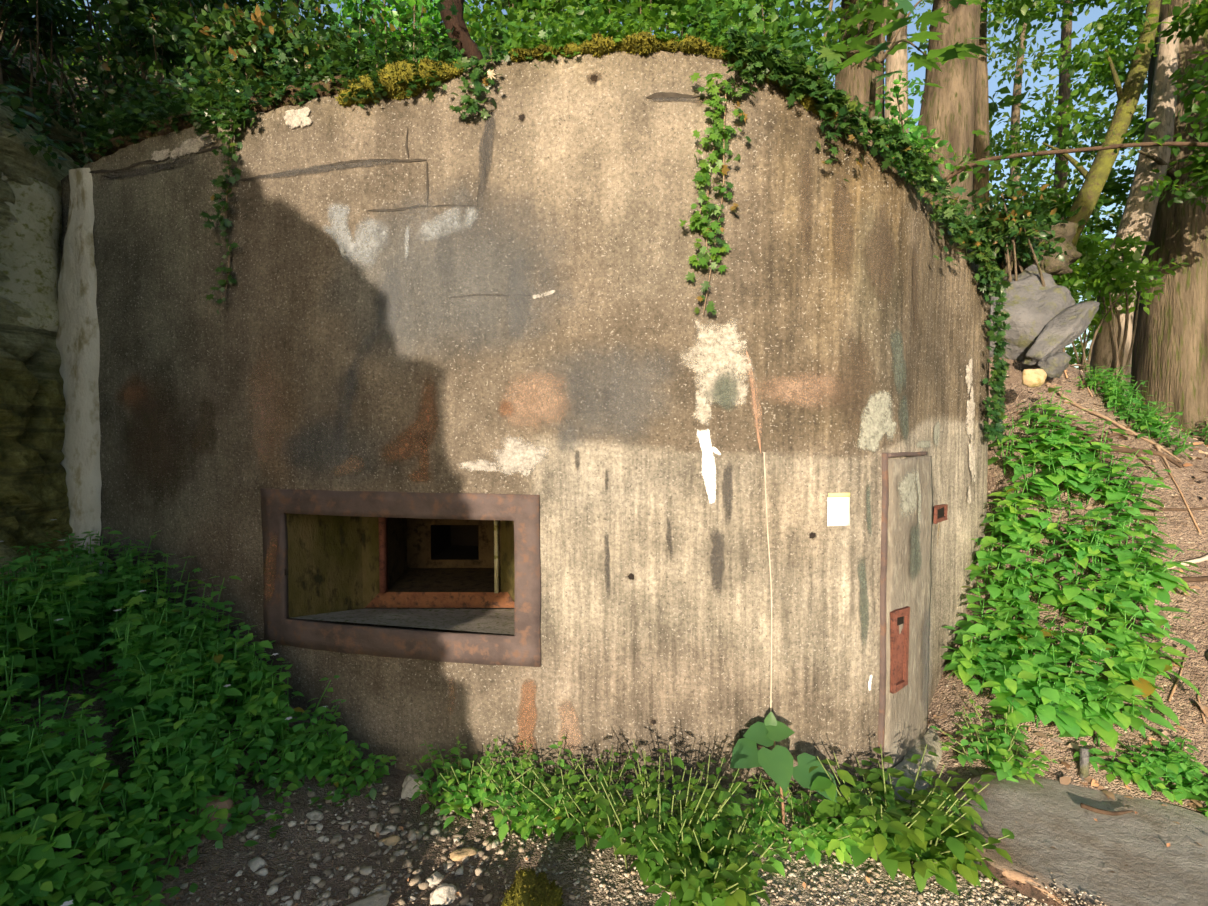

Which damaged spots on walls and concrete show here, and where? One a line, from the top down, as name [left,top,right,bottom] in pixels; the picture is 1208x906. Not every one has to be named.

crack [239,111,495,211]
damp [680,321,753,520]
damp [711,532,724,592]
damp [858,560,869,643]